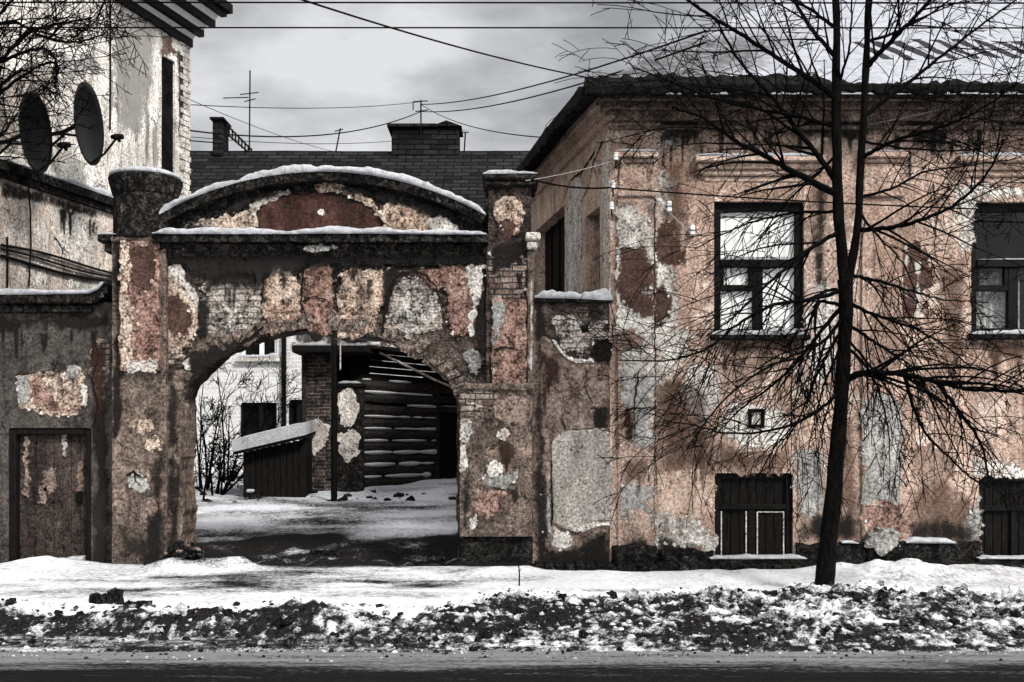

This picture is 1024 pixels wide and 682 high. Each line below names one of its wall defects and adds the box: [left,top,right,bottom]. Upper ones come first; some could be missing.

peeling [15,130,838,529]
flaking render [537,481,719,552]